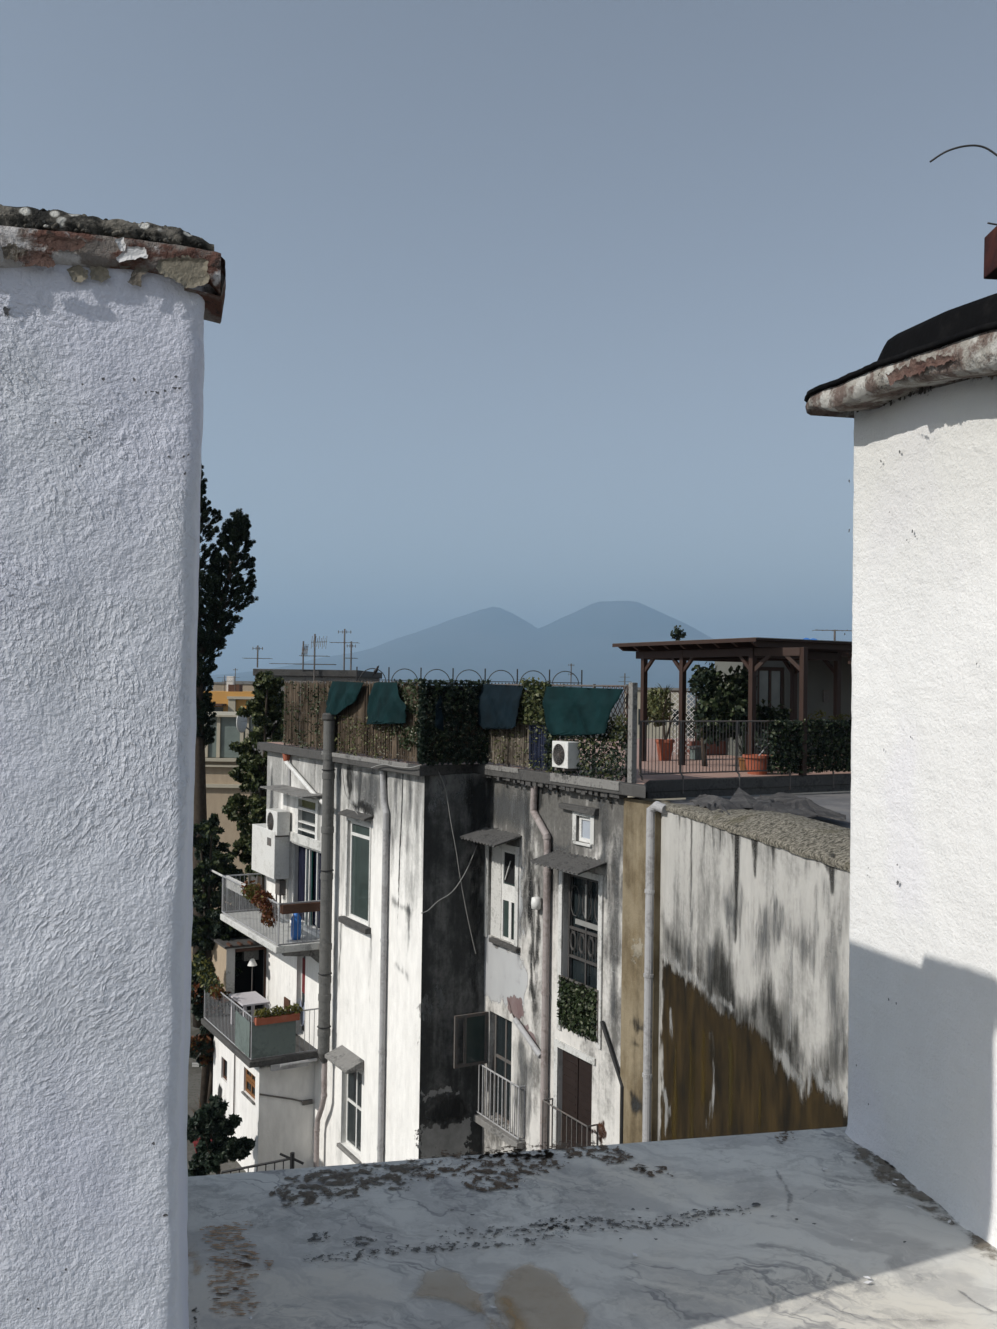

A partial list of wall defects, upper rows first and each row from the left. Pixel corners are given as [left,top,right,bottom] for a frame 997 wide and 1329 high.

spalling [2,234,210,288]
peeling [886,355,955,386]
leakage [340,763,411,818]
leakage [465,776,559,1011]
leakage [679,816,775,941]
leakage [826,853,834,893]
leakage [755,913,776,950]
leakage [667,930,844,1098]